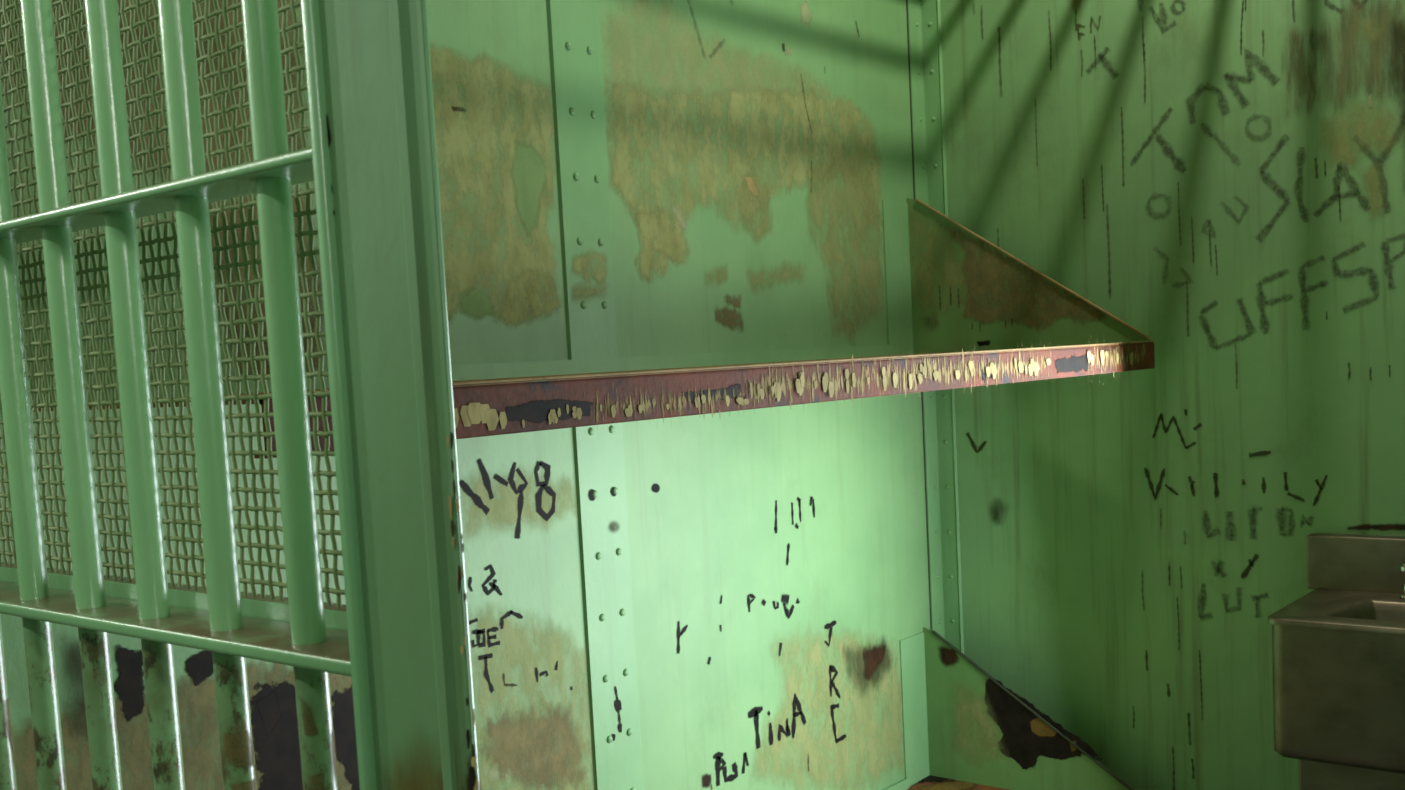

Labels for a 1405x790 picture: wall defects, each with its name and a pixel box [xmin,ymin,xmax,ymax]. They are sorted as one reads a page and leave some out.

peeling [447,213,1147,602]
peeling [939,647,958,666]
rust [224,731,257,790]
rust [302,705,337,790]
peeling [958,678,1102,770]